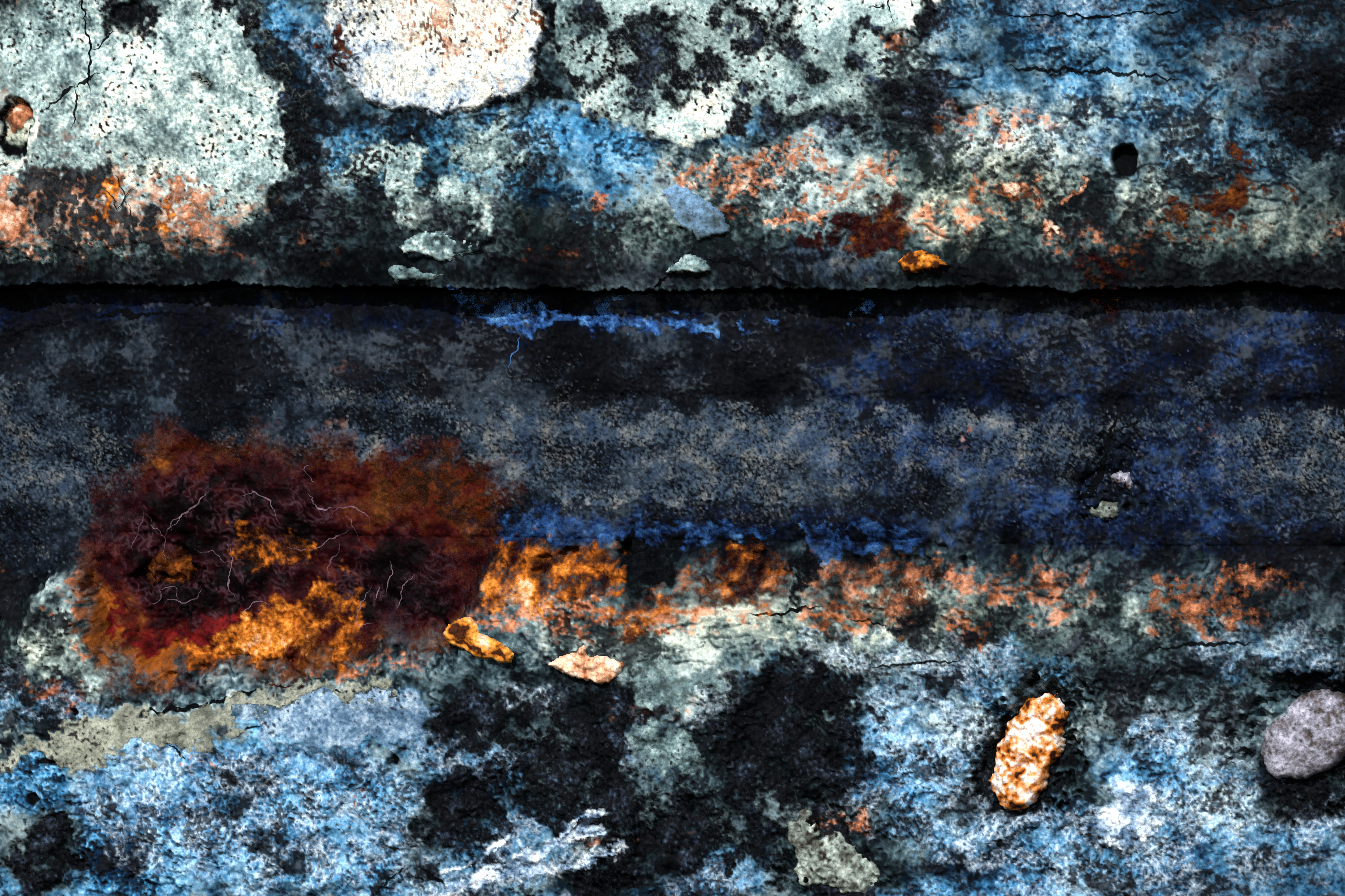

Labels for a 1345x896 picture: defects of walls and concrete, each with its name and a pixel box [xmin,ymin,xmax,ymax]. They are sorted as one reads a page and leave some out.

crack [20,0,114,128]
mould [96,0,162,45]
damp [212,0,321,223]
damp [521,0,966,140]
rust [0,166,252,259]
rust [667,129,917,258]
rust [995,183,1020,196]
rust [1074,140,1298,321]
rust [71,426,921,692]
rust [1147,561,1284,630]
flaking render [0,669,436,773]